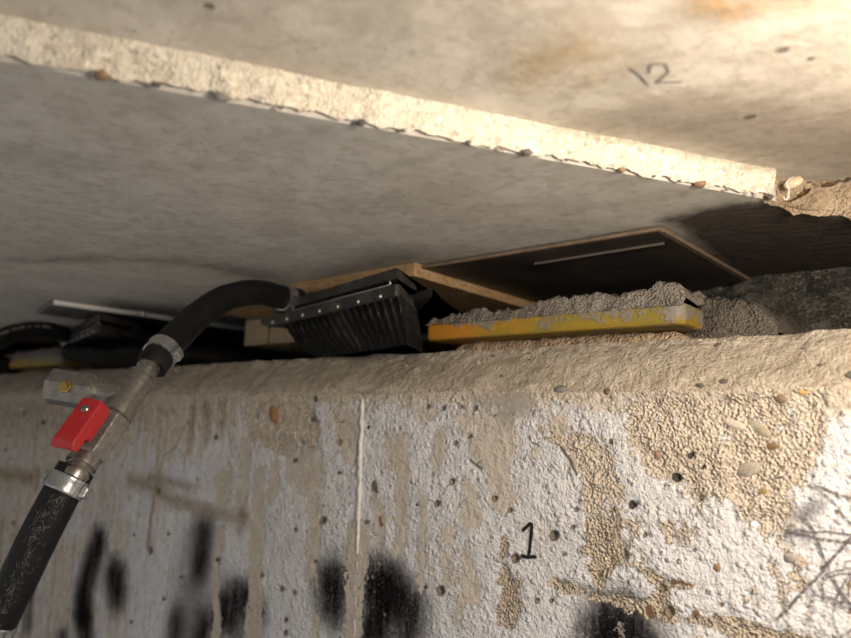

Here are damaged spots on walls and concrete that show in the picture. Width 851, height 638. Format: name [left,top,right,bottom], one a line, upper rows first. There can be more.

peeling [209,525,225,638]
spalling [214,393,325,638]
peeling [336,409,370,475]
peeling [343,406,525,638]
spalling [531,387,832,638]